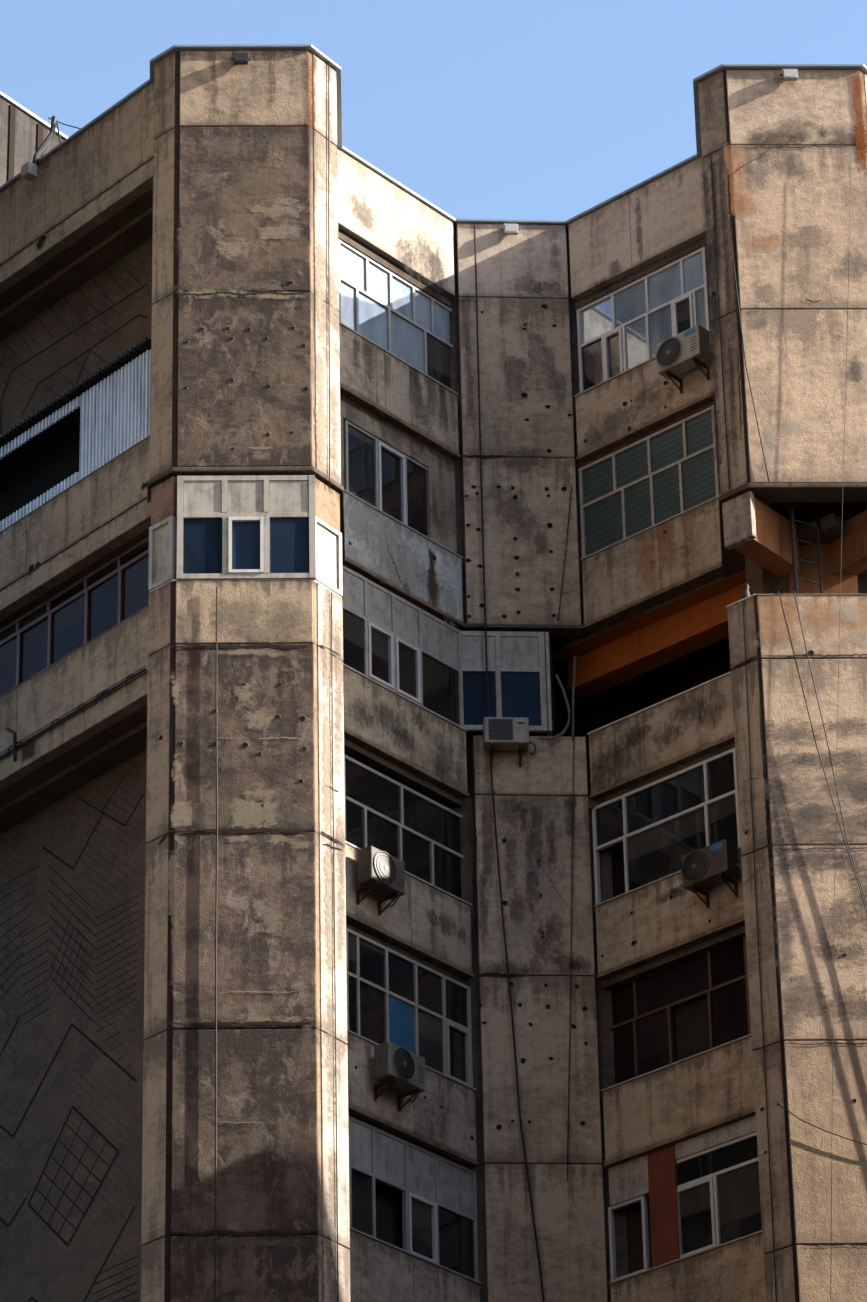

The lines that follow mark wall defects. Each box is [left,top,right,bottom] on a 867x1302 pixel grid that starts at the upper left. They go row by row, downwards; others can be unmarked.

rust [307,52,316,125]
rust [851,72,867,170]